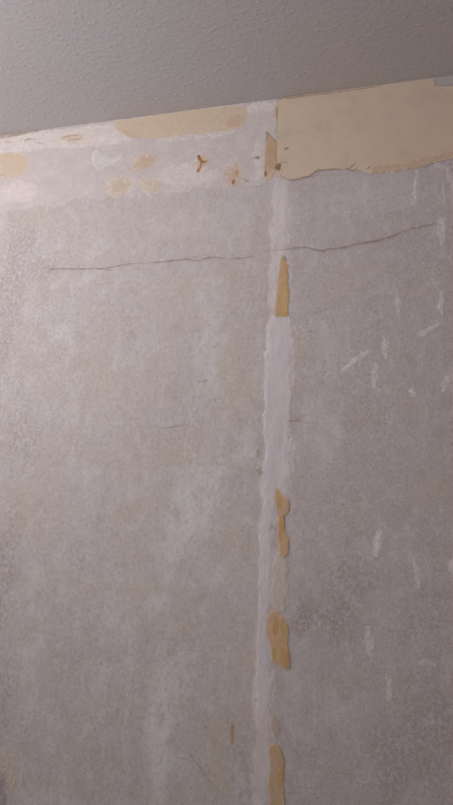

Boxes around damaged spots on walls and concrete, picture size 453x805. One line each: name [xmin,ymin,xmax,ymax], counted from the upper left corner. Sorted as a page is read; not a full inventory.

peeling [0,78,453,211]
crack [279,225,424,252]
peeling [274,255,289,317]
peeling [274,488,289,557]
peeling [266,609,290,671]
peeling [268,744,285,805]